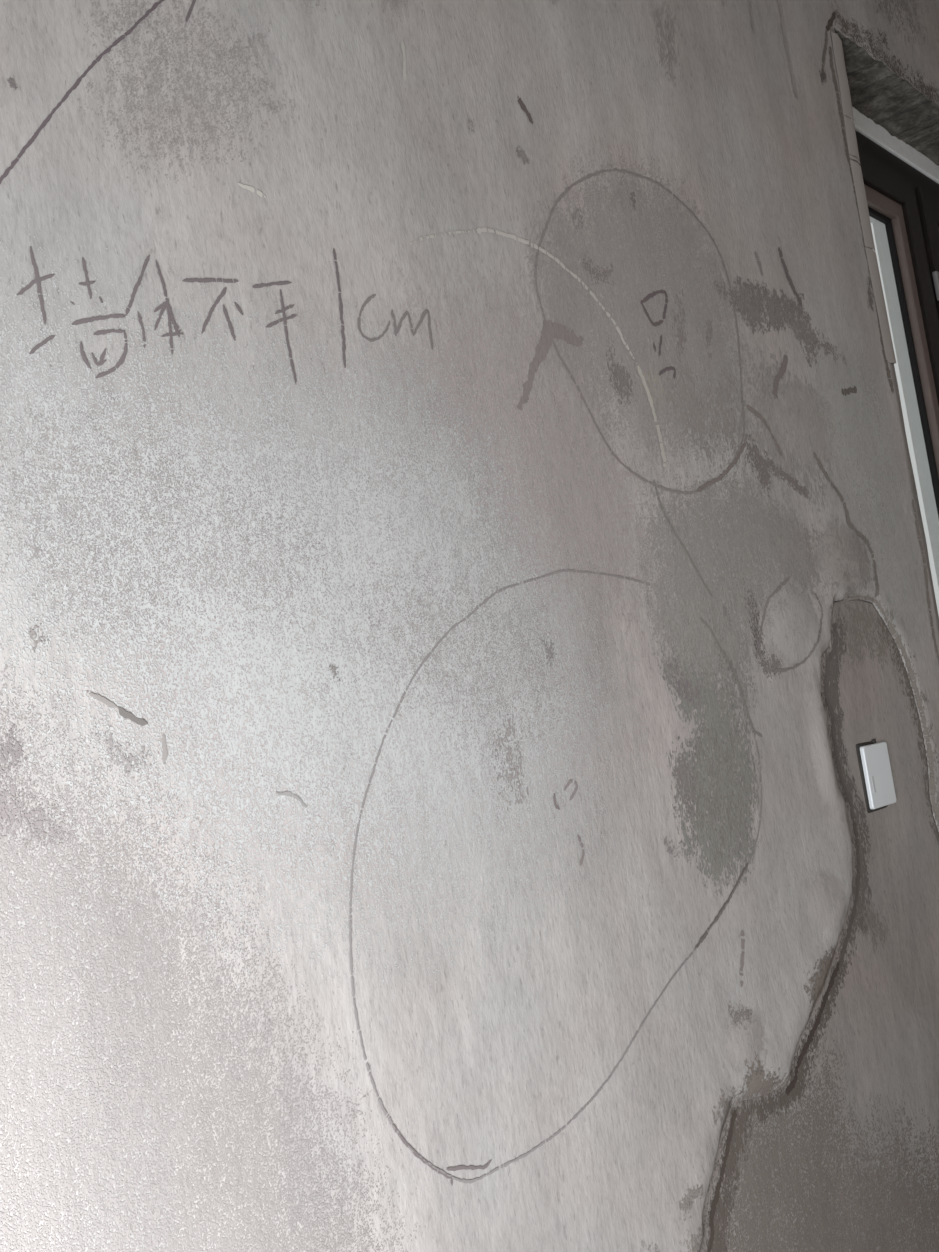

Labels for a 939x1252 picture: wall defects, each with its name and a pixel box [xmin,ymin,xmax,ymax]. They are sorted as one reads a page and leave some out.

leakage [514,143,939,896]